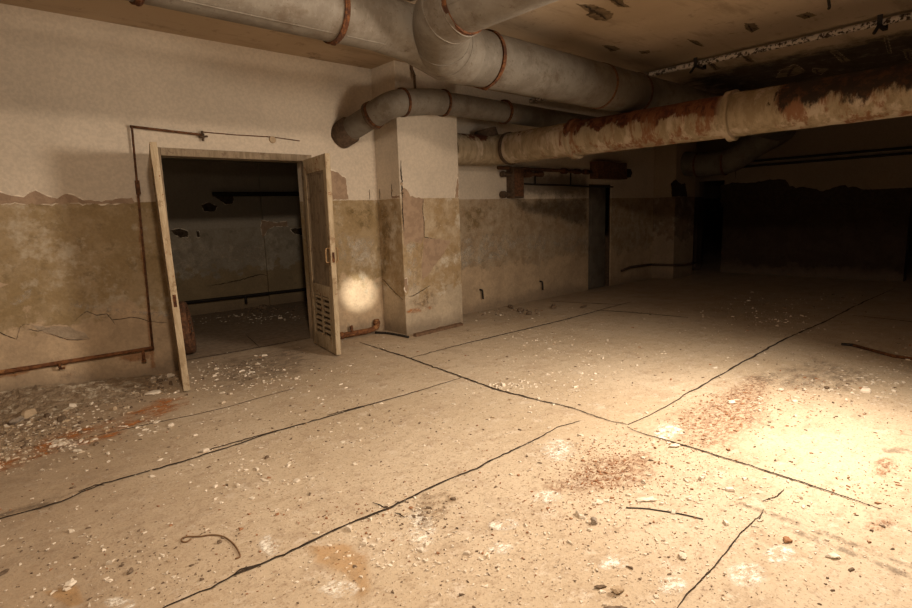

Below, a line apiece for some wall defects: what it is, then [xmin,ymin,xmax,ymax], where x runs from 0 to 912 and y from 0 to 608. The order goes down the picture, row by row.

spalling [576,0,631,21]
peeling [0,189,135,206]
peeling [331,169,349,200]
peeling [392,188,425,247]
rust [0,399,177,469]